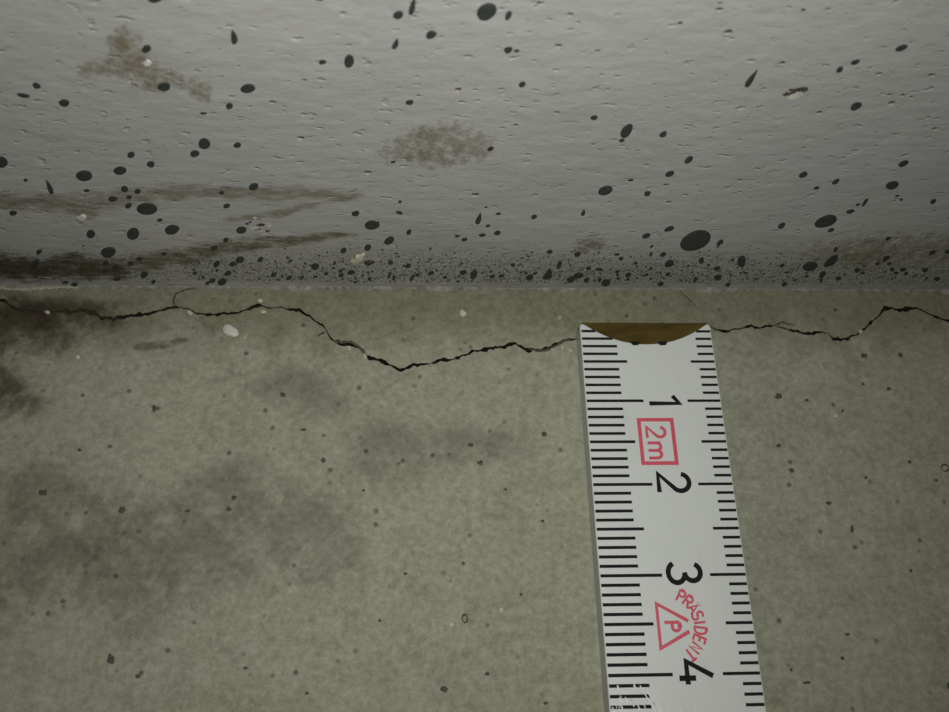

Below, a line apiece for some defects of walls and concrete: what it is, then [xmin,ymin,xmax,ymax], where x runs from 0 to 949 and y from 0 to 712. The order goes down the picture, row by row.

leakage [0,232,347,283]
leakage [0,302,115,352]
crack [59,287,576,372]
crack [710,305,949,342]